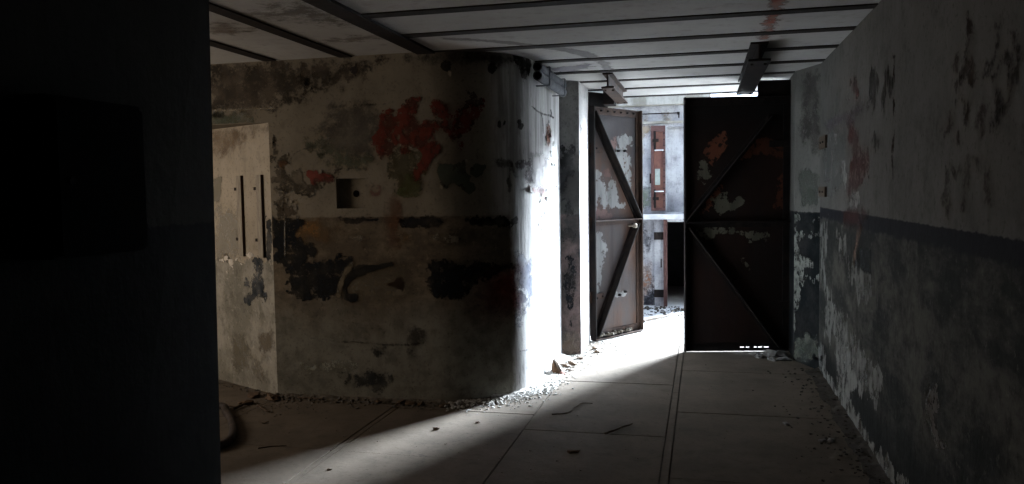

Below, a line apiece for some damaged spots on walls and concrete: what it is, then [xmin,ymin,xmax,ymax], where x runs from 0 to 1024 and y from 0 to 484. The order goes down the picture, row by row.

peeling [219,134,353,306]
peeling [397,215,444,229]
peeling [425,258,517,301]
peeling [794,213,909,484]